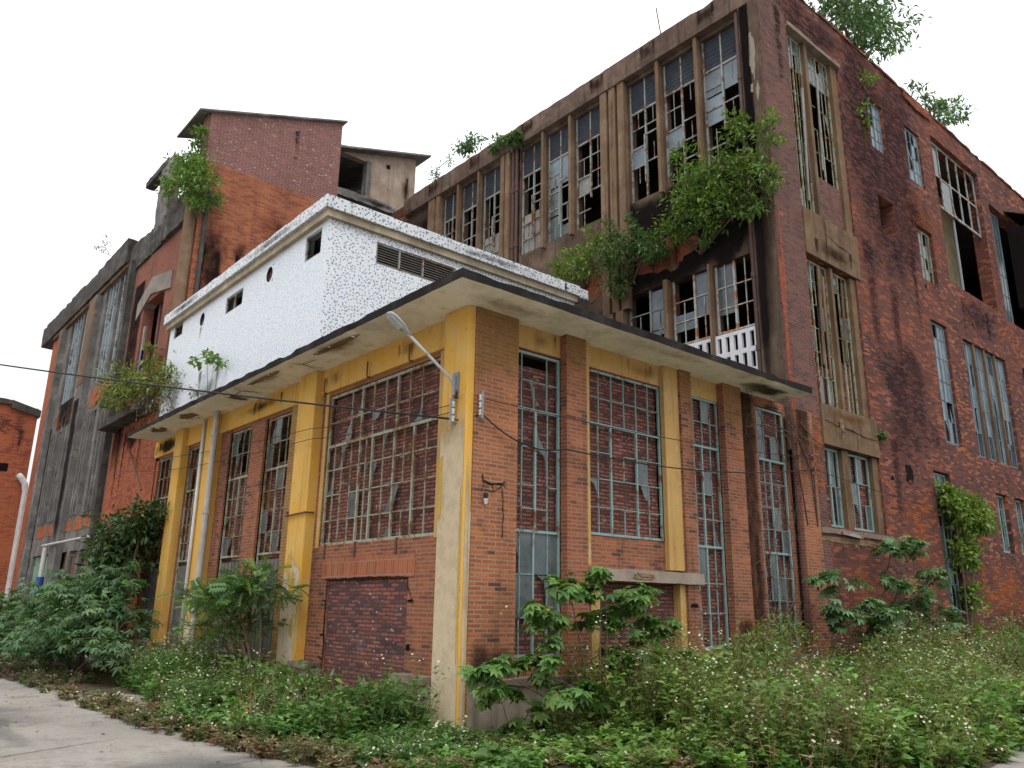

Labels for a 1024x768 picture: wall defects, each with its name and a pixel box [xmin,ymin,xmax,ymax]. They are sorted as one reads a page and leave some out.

peeling [748,32,760,100]
water stain [774,0,923,339]
water stain [199,238,220,288]
peeling [276,552,300,665]